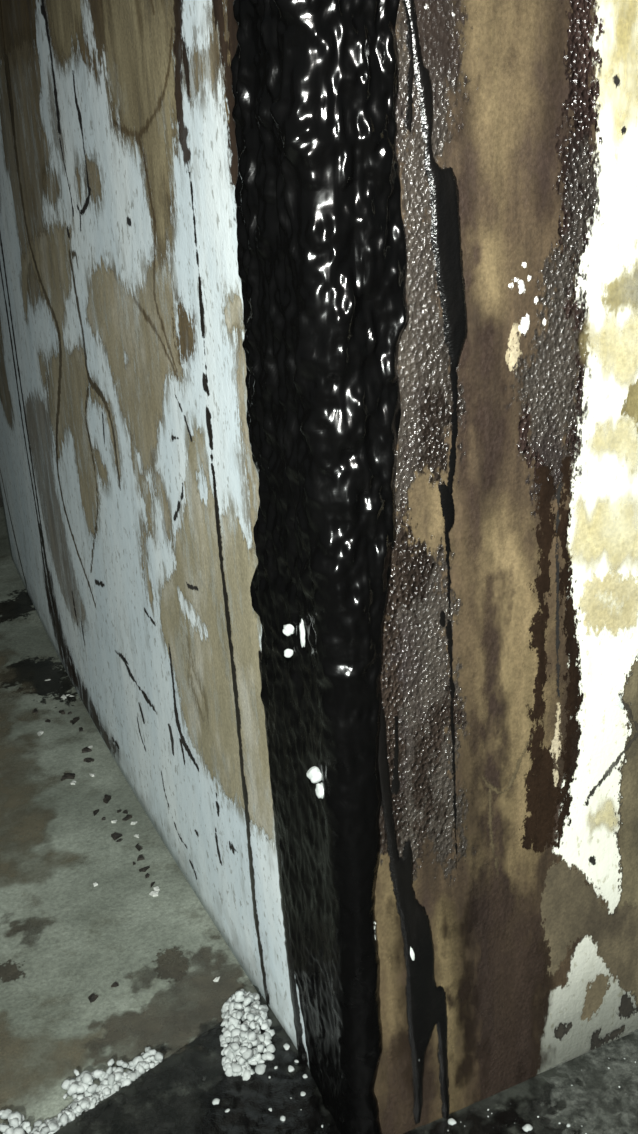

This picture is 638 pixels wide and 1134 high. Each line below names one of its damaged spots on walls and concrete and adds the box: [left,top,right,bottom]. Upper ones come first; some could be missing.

leakage [0,0,274,840]
leakage [374,0,638,1134]
leakage [6,920,49,945]
leakage [0,651,79,885]
leakage [0,937,245,1111]
crack [112,608,238,880]
peeling [540,655,638,1050]